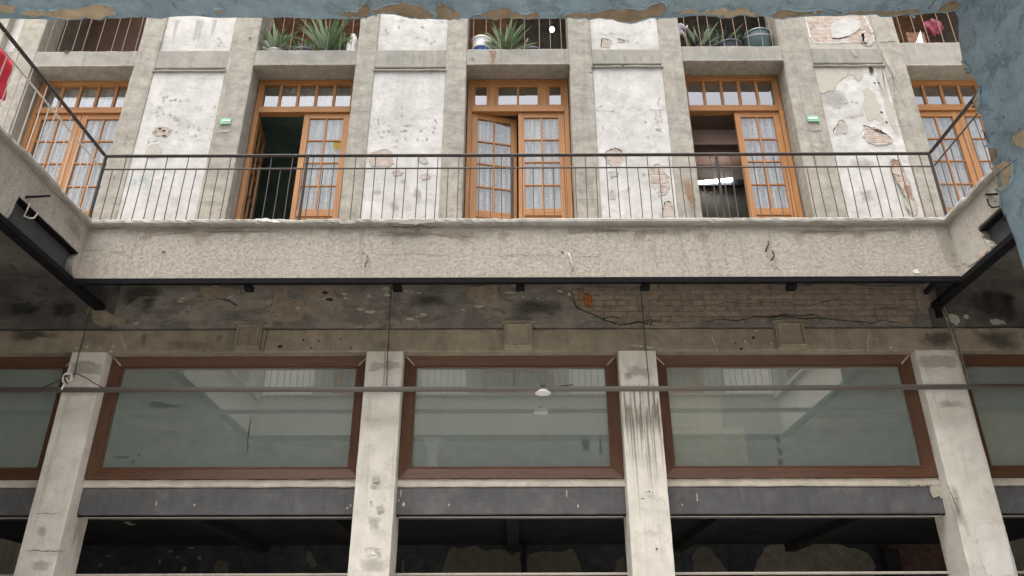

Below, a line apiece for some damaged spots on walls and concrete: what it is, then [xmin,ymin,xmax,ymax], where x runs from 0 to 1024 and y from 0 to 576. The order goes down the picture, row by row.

peeling [0,1,118,20]
peeling [336,0,542,44]
peeling [560,0,963,48]
peeling [147,95,210,145]
peeling [369,106,438,179]
peeling [862,111,893,146]
peeling [969,86,1024,220]
peeling [649,162,675,218]
peeling [962,235,988,266]
crack [572,292,658,328]
crack [704,300,909,352]
water stain [624,391,661,467]